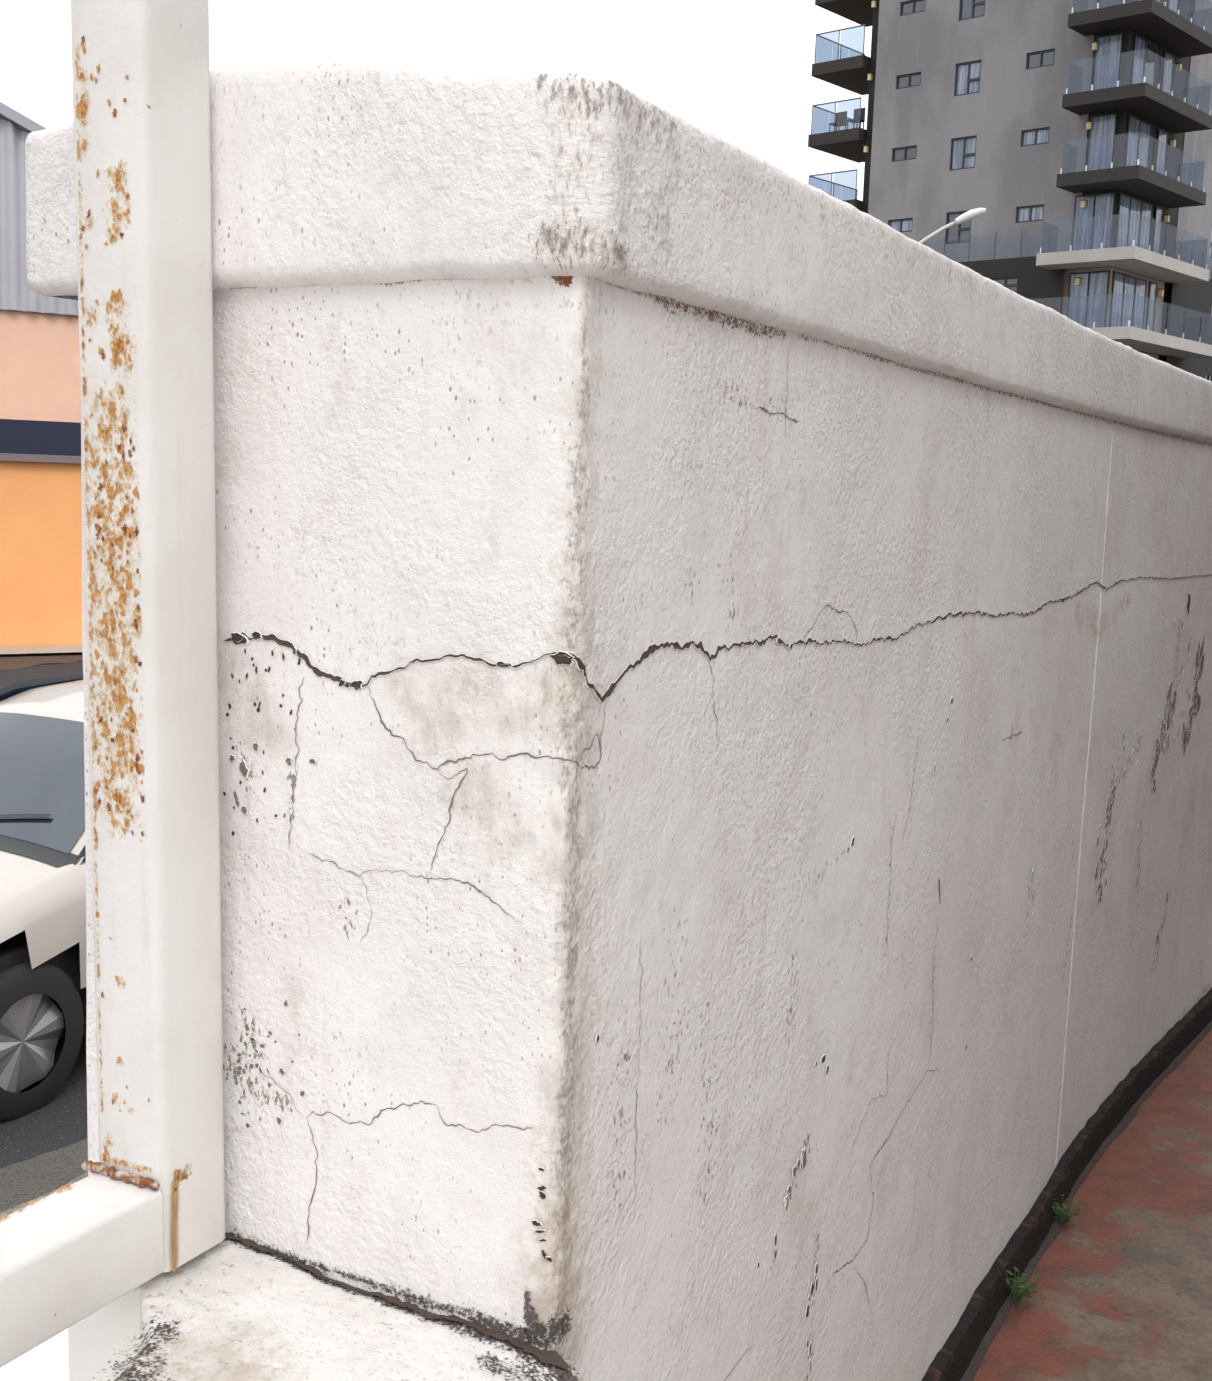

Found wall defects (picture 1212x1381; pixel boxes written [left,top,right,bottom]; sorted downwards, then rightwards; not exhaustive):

damp [525,73,675,138]
damp [528,209,637,283]
corrosion [75,35,144,1112]
crack [224,574,1212,943]
corrosion [102,1135,151,1172]
corrosion [171,1166,191,1272]